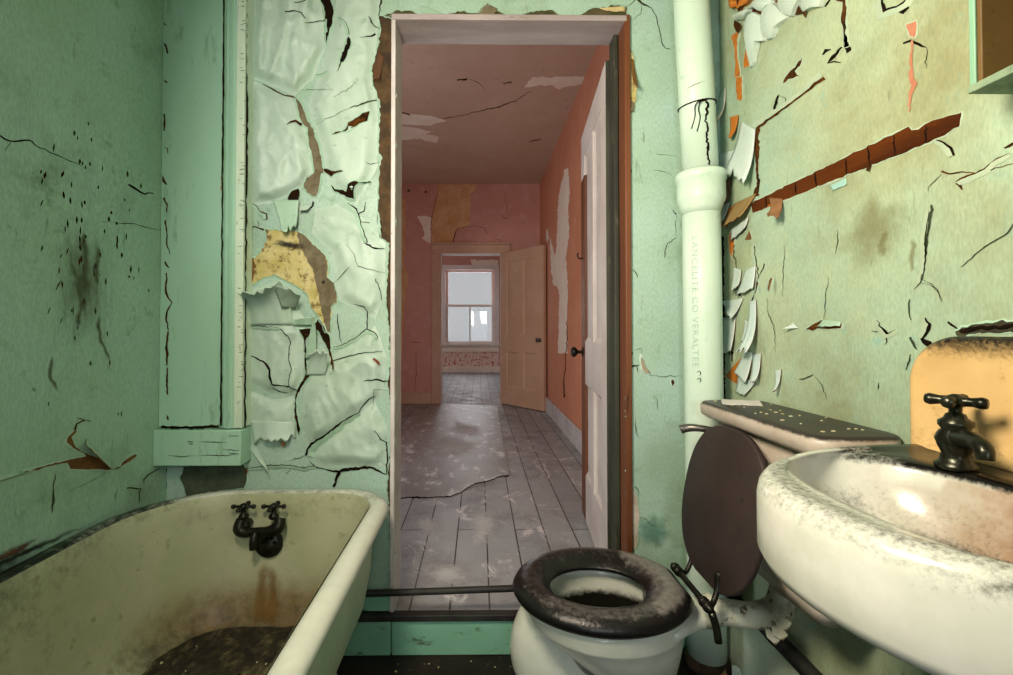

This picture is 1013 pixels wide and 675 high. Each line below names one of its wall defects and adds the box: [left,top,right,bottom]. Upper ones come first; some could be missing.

flaking render [581,3,628,15]
peeling [726,0,825,68]
crack [751,47,842,197]
crack [876,0,913,21]
crack [903,39,928,112]
water stain [56,171,111,365]
flaking render [252,227,338,333]
flaking render [370,2,506,405]
crack [723,350,749,399]
crack [721,236,785,349]
crack [873,140,1013,370]
spalling [954,318,1013,336]